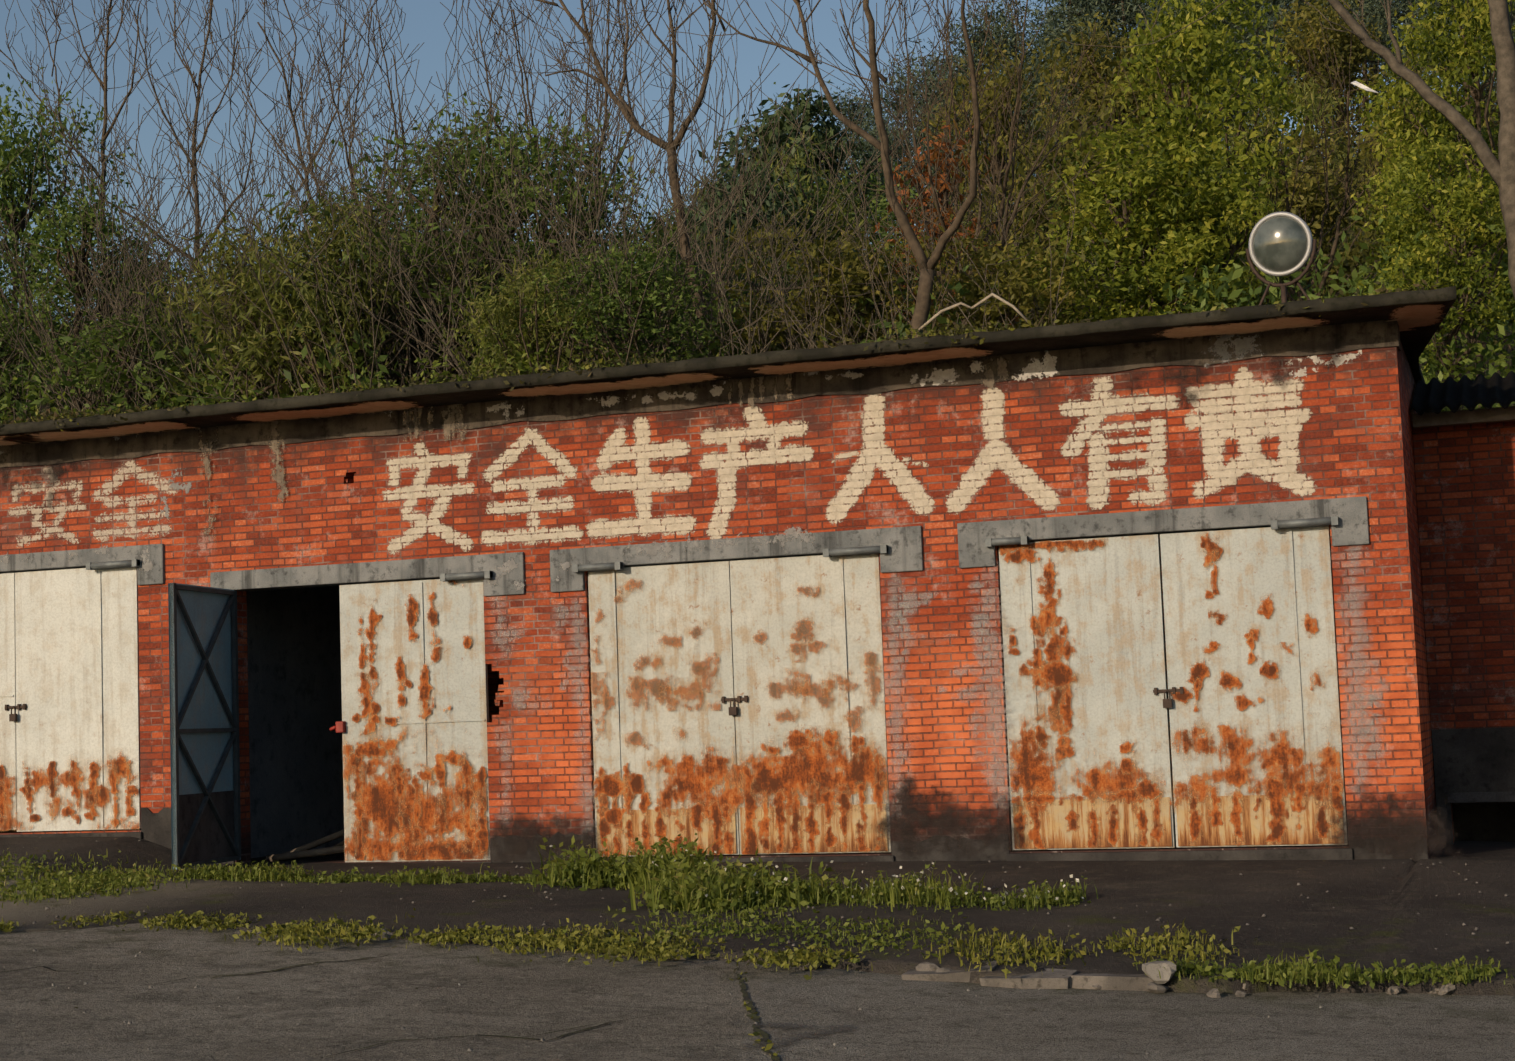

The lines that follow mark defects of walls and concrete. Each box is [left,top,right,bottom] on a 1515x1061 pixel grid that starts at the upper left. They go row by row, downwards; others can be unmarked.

rust [0,752,139,831]
rust [343,580,489,861]
rust [591,579,721,740]
rust [594,618,888,857]
rust [797,587,820,597]
damp [883,779,1021,856]
rust [998,533,1344,849]
crack [734,967,780,1061]